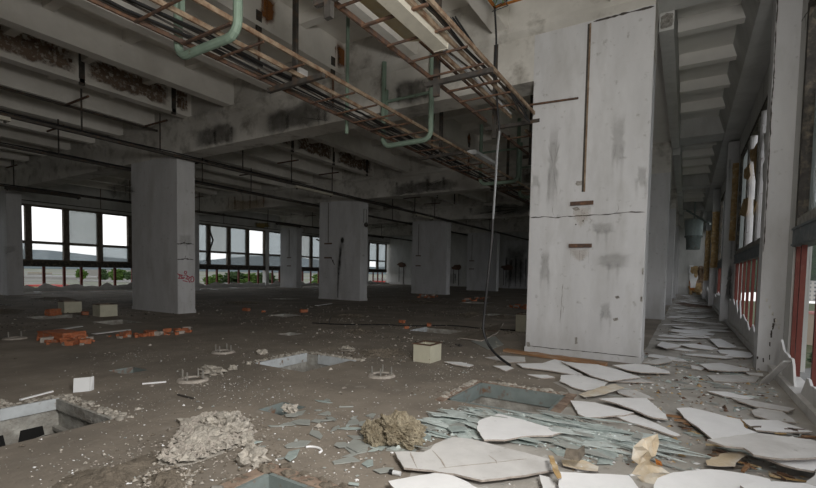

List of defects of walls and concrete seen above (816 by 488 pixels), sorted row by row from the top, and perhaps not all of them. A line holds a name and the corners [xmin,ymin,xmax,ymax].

peeling [0,25,72,71]
peeling [90,62,187,111]
crack [763,0,778,252]
crack [531,207,641,219]